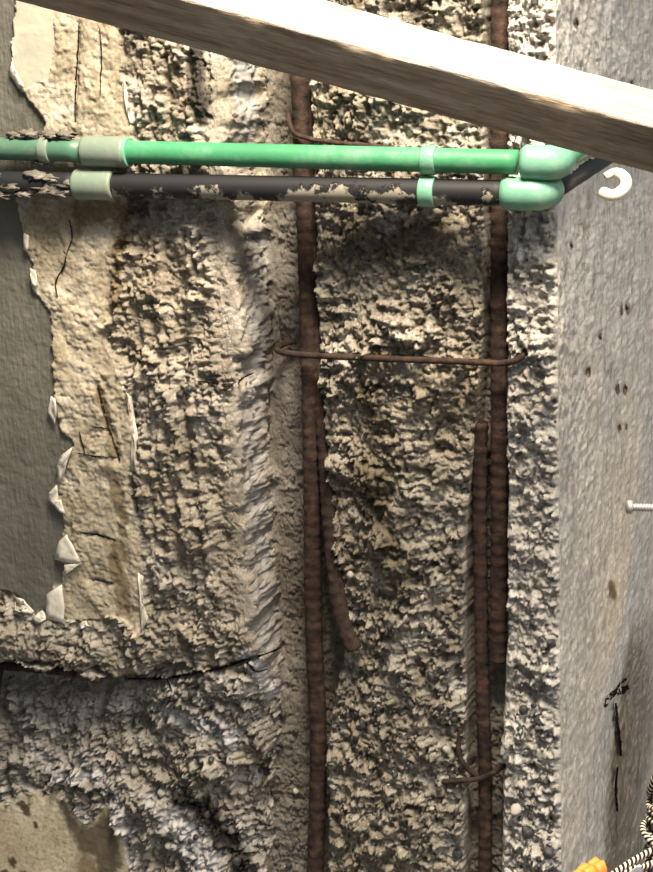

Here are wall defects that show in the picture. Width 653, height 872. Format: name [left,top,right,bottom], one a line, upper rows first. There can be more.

spalling [326,0,556,64]
spalling [9,0,269,144]
spalling [290,74,549,152]
spalling [27,161,267,176]
spalling [294,168,520,180]
crack [78,385,121,461]
spalling [0,195,562,872]
crack [125,647,281,703]
water stain [16,800,38,828]
water stain [50,769,138,872]